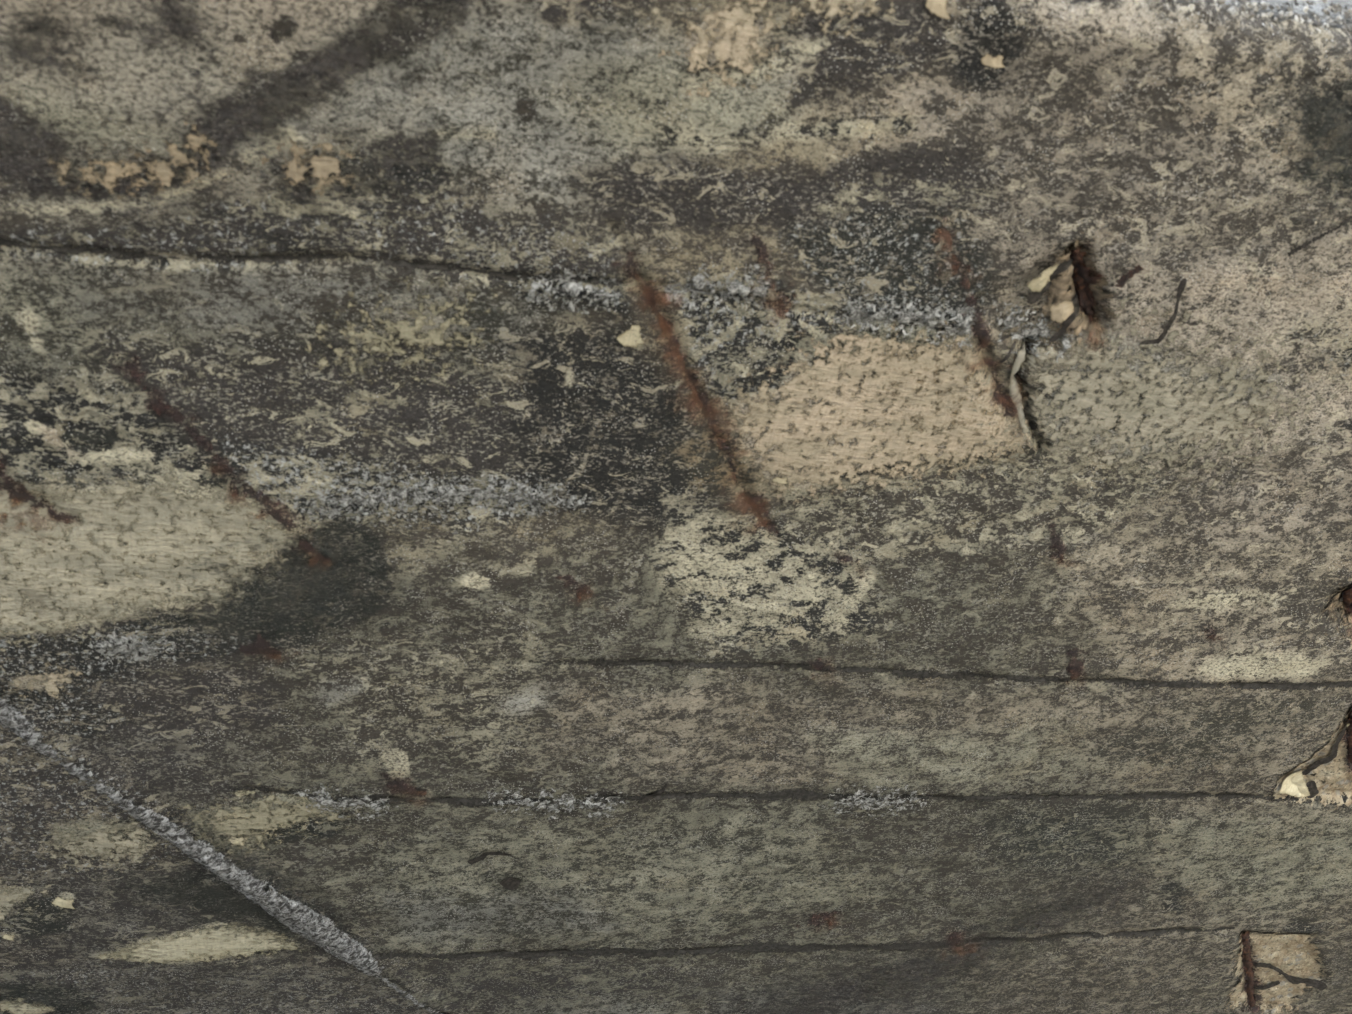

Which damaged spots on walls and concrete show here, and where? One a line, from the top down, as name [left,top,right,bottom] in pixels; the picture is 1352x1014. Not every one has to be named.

rust [933,208,1021,417]
rust [612,248,779,536]
peeling [709,232,1345,505]
rust [0,453,89,535]
crack [638,784,667,804]
spalling [1269,707,1352,811]
crack [468,852,521,890]
spalling [1224,929,1335,1014]